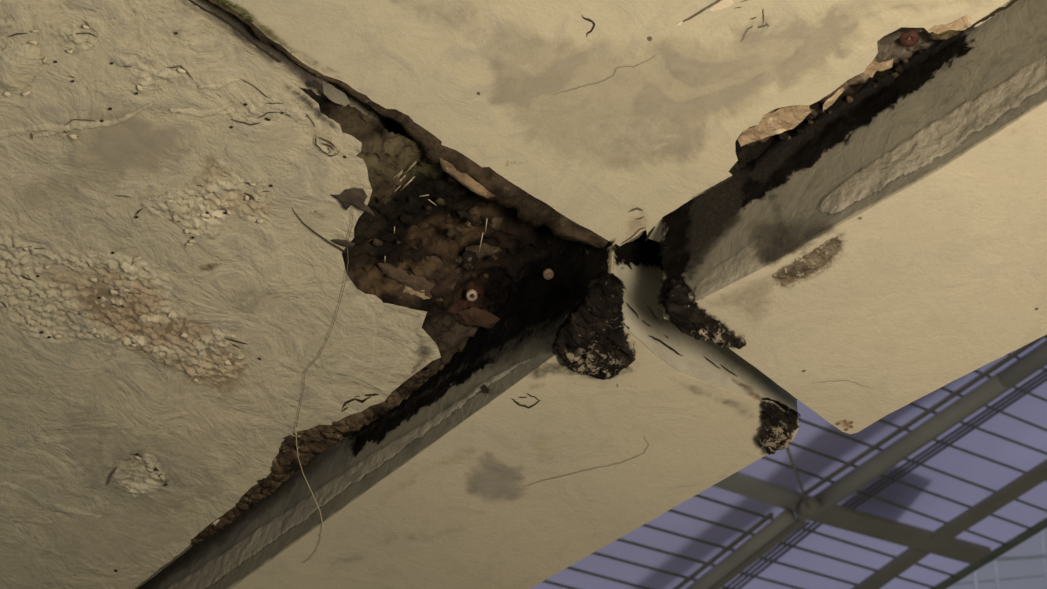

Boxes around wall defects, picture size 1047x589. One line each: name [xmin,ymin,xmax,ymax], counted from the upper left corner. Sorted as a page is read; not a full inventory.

peeling [0,228,261,389]
peeling [115,158,273,247]
flaking render [167,357,535,589]
spalling [190,79,563,545]
water stain [138,194,747,589]
water stain [616,11,857,163]
flaking render [694,237,784,300]
water stain [754,398,800,455]
spalling [729,15,974,175]
water stain [681,0,1047,291]